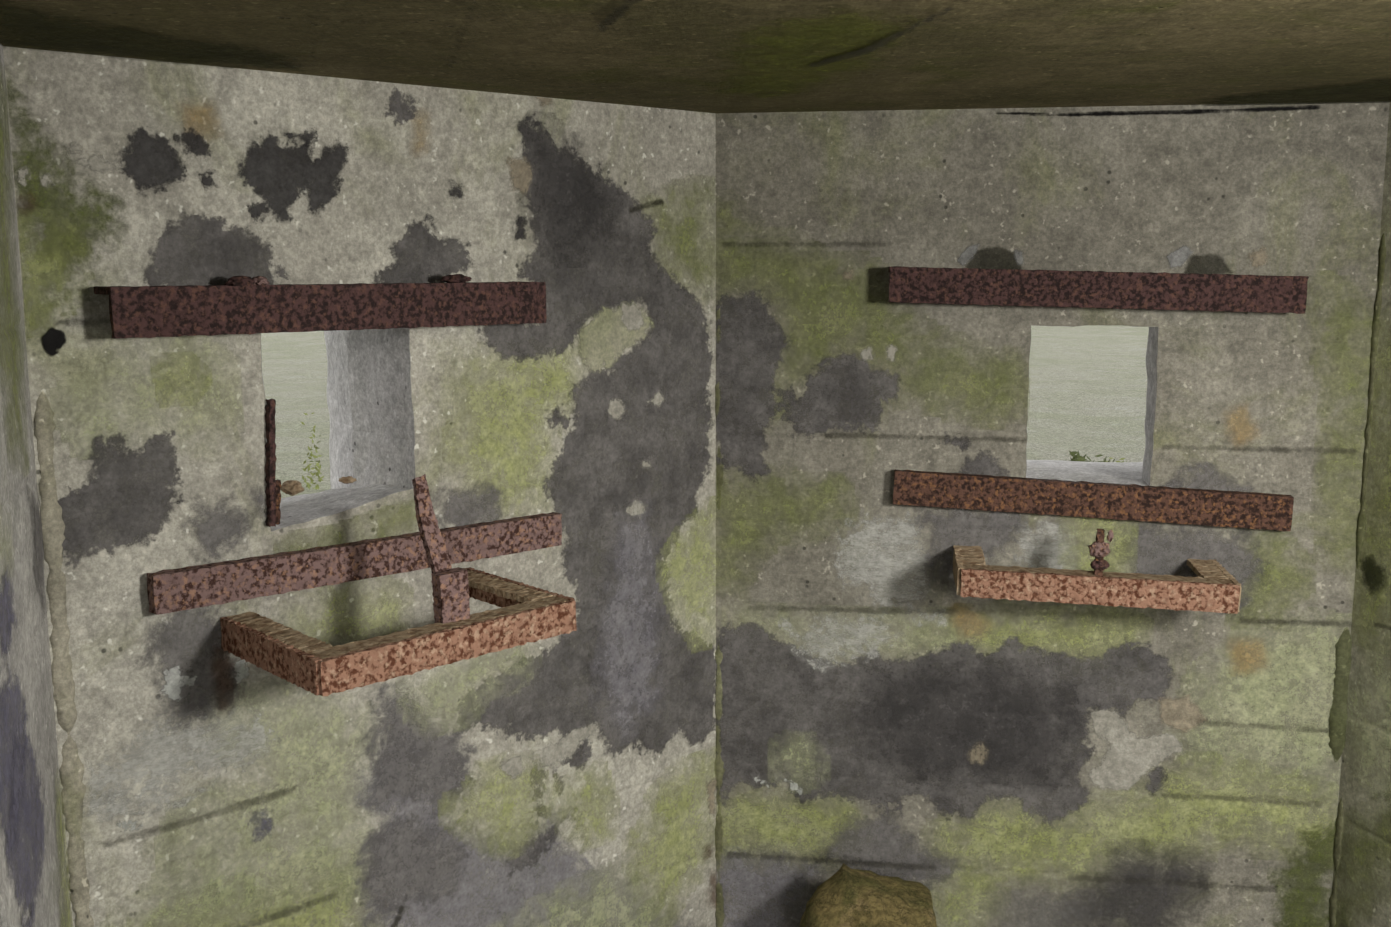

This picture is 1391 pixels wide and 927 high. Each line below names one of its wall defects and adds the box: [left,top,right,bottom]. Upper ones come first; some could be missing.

water stain [117,128,215,193]
water stain [144,131,349,286]
water stain [27,478,45,609]
water stain [57,430,183,568]
water stain [190,492,267,559]
water stain [356,114,1173,927]
water stain [0,573,45,927]